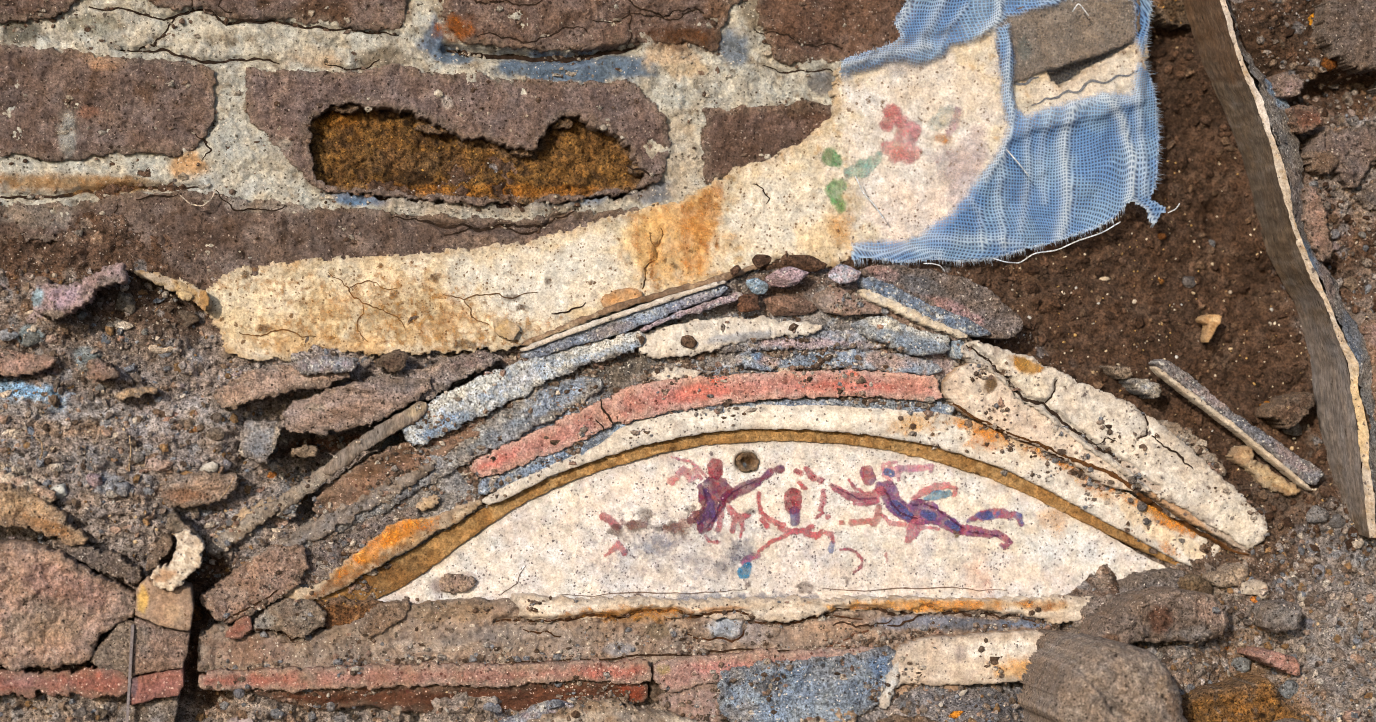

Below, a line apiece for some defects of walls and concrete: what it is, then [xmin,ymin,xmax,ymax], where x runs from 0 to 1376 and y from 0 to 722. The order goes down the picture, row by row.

peeling [1303,83,1371,129]
spalling [309,104,644,205]
crack [239,329,316,338]
crack [328,272,406,342]
peeling [0,270,212,538]
peeling [239,424,401,499]
crack [952,345,1250,556]
peeling [258,518,289,548]
peeling [225,615,253,639]
peeling [1278,580,1376,719]